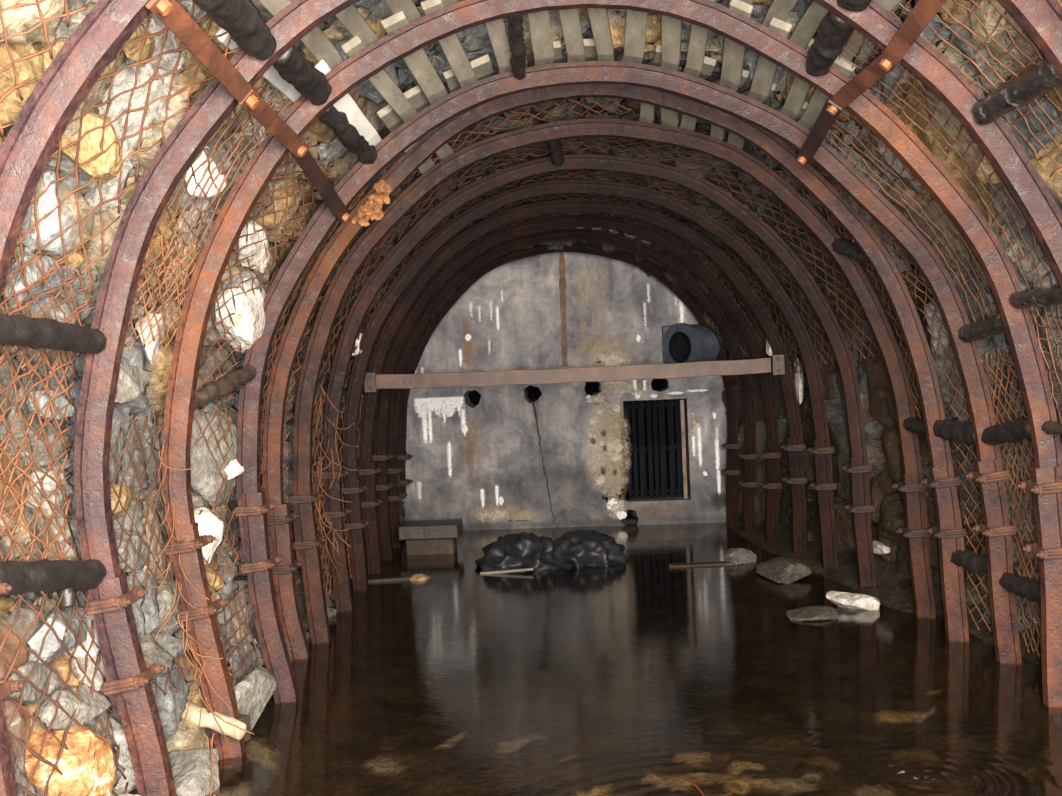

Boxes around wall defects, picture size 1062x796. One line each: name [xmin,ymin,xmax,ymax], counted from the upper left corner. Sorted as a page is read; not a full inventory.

efflorescence [414,396,468,443]
spalling [586,395,628,519]